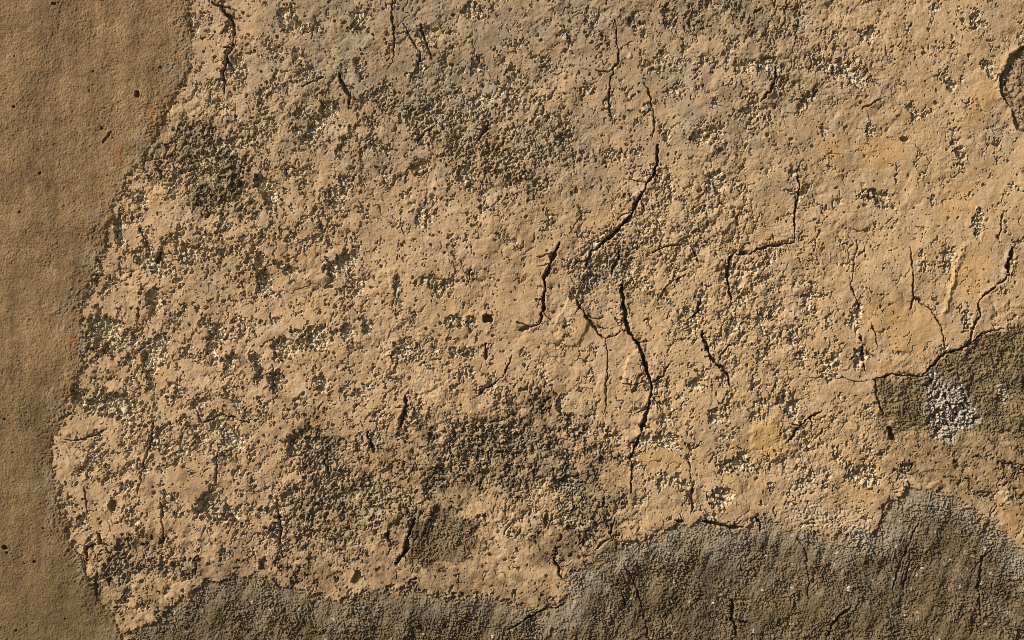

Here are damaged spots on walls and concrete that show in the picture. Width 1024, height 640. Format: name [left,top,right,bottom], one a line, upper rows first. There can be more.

spalling [112,208,126,249]
crack [725,168,801,301]
spalling [88,315,122,364]
spalling [140,341,160,394]
spalling [145,285,163,319]
crack [516,82,671,494]
crack [651,243,700,299]
crack [692,298,733,388]
crack [809,211,1016,415]
spalling [69,385,126,418]
spalling [191,492,241,528]
crack [676,458,762,533]